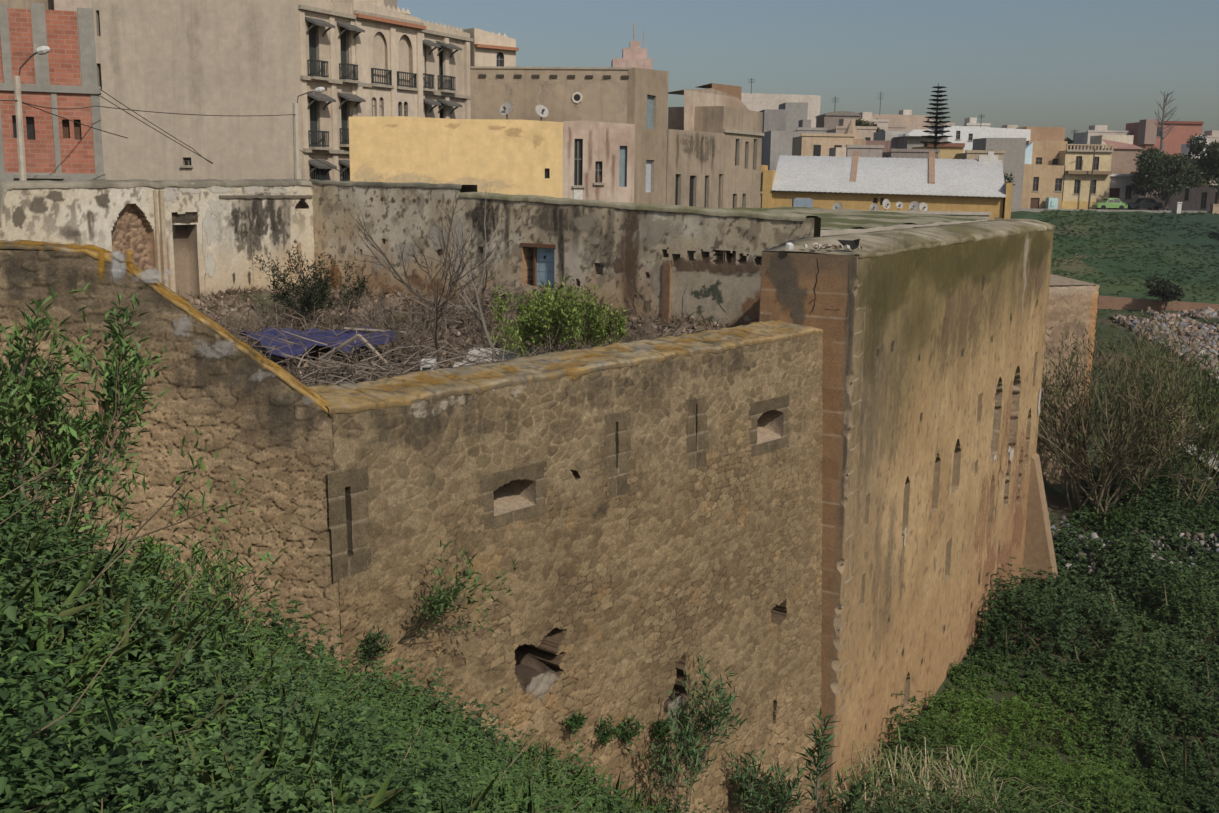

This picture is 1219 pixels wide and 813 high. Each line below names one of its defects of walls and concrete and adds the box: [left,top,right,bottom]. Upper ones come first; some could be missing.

flaking render [13,191,65,228]
flaking render [95,194,109,207]
leakage [231,194,290,258]
leakage [531,204,639,293]
spalling [662,247,762,276]
spalling [731,292,760,327]
leakage [768,251,807,324]
crack [809,260,840,313]
hole [514,627,567,698]
hole [663,652,687,724]